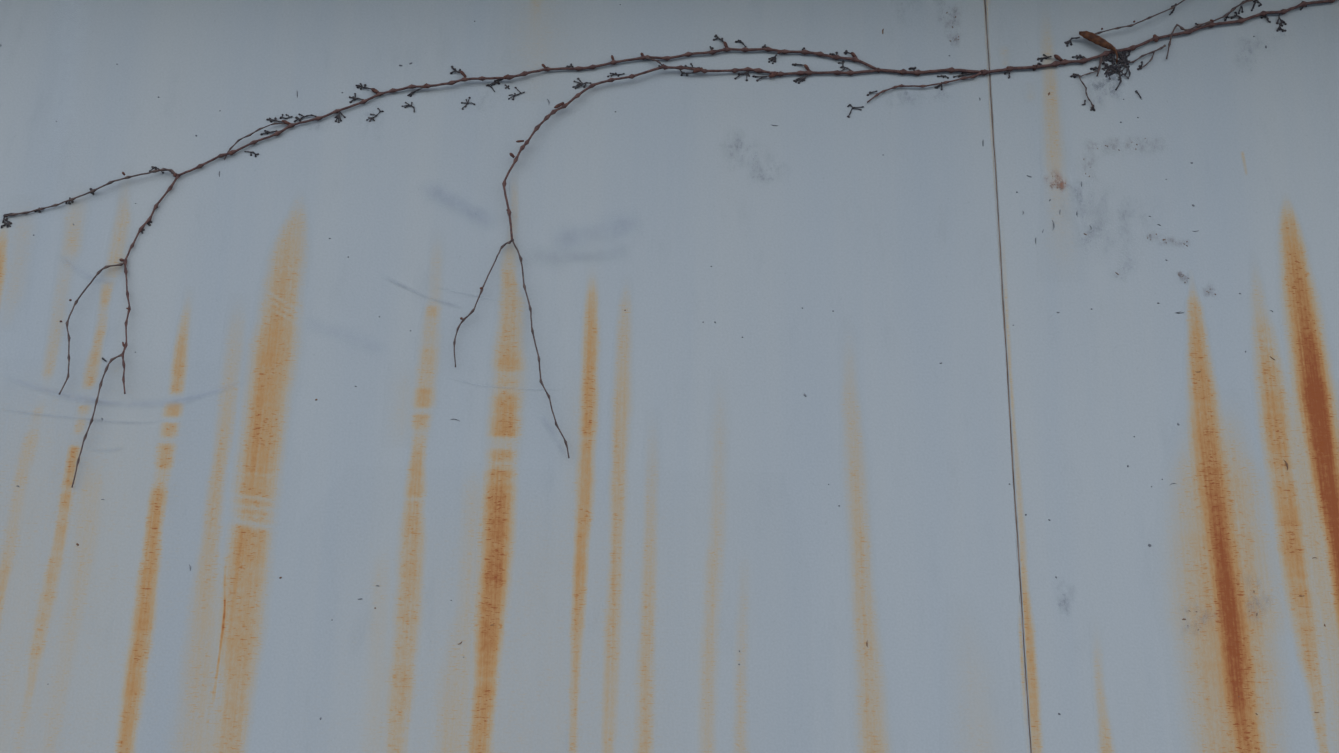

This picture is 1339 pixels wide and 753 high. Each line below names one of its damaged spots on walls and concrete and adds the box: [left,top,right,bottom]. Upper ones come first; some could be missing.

rust [484,0,591,102]
rust [1323,0,1339,43]
rust [0,163,815,753]
rust [1152,193,1339,753]